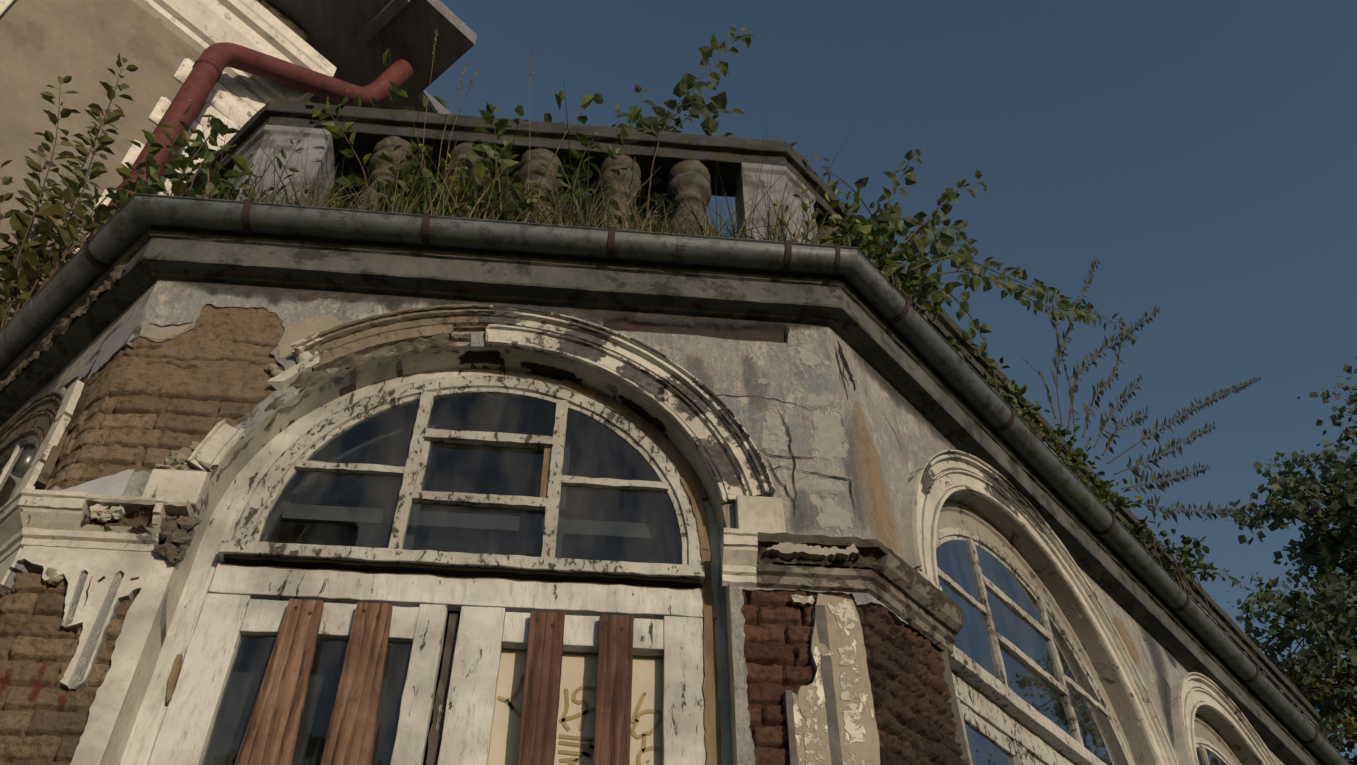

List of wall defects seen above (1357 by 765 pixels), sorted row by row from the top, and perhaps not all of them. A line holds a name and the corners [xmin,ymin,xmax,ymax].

crack [717,394,855,517]
peeling [796,392,849,461]
crack [837,340,856,391]
spalling [0,304,831,765]
spalling [741,590,964,765]